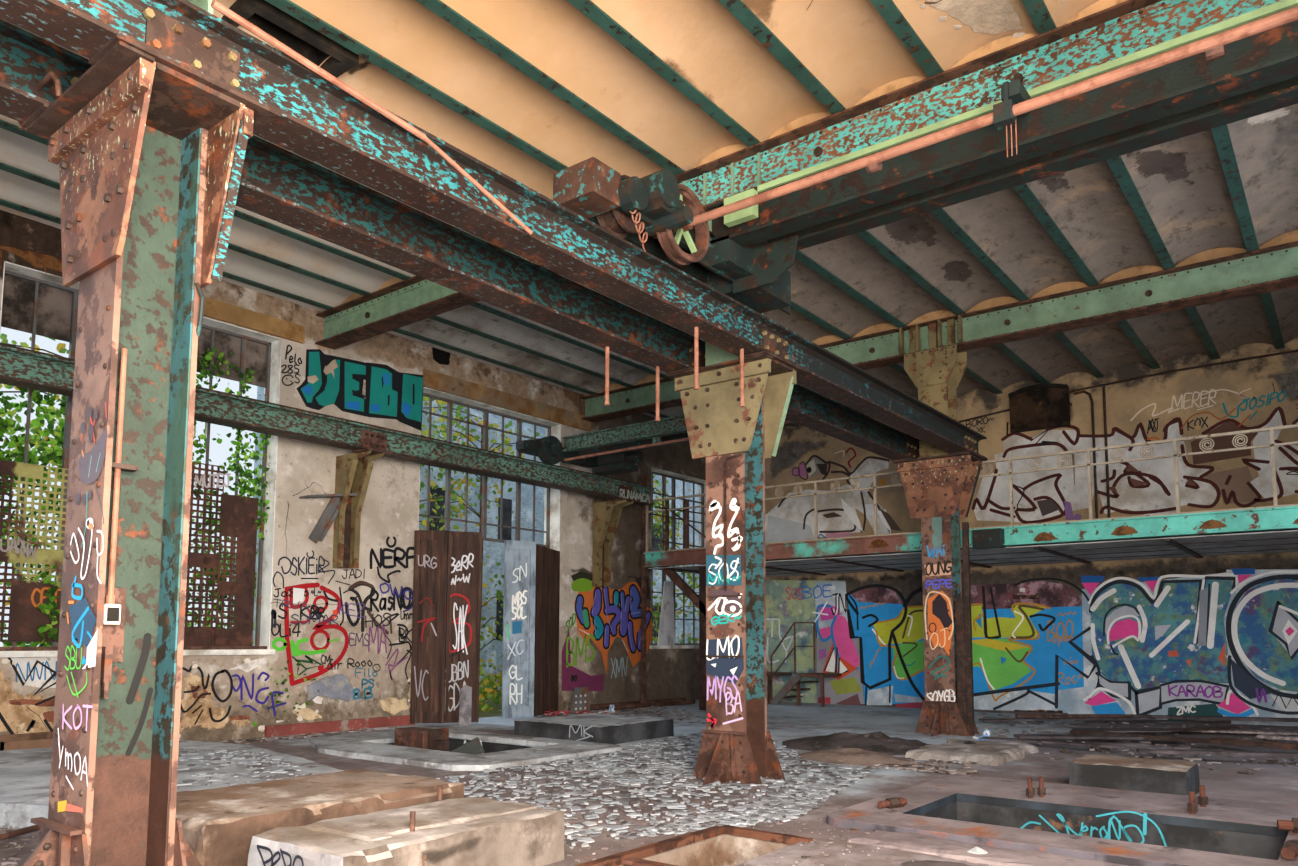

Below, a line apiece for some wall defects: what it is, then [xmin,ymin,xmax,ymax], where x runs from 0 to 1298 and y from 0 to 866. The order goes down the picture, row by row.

spalling [920,0,1026,38]
corrosion [1198,519,1226,530]
corrosion [1111,526,1138,536]
corrosion [1034,532,1057,542]